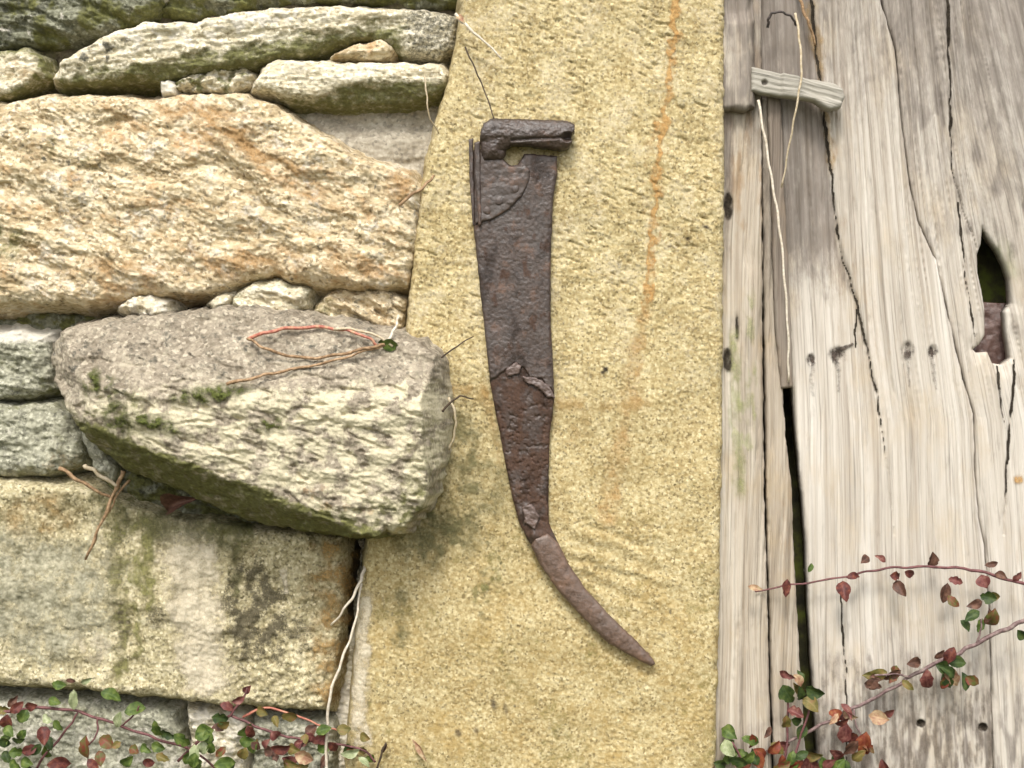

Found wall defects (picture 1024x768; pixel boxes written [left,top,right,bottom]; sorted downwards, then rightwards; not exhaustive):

corrosion [641,0,683,304]
damp [95,517,234,695]
damp [228,526,243,596]